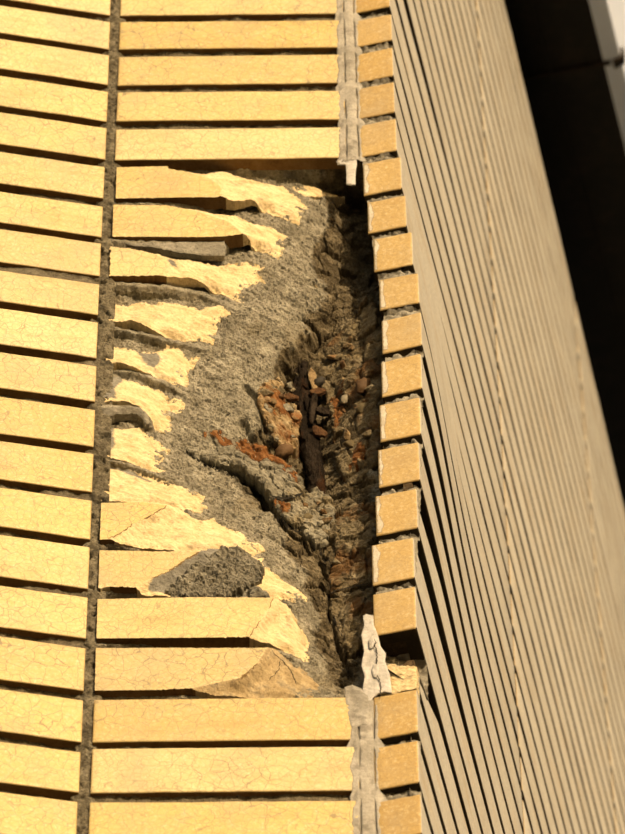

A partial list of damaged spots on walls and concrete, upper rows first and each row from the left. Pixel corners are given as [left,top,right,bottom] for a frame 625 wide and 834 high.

rust [270,360,346,442]
crack [188,454,248,487]
rust [203,430,297,483]
spalling [95,158,469,834]
crack [264,493,373,636]